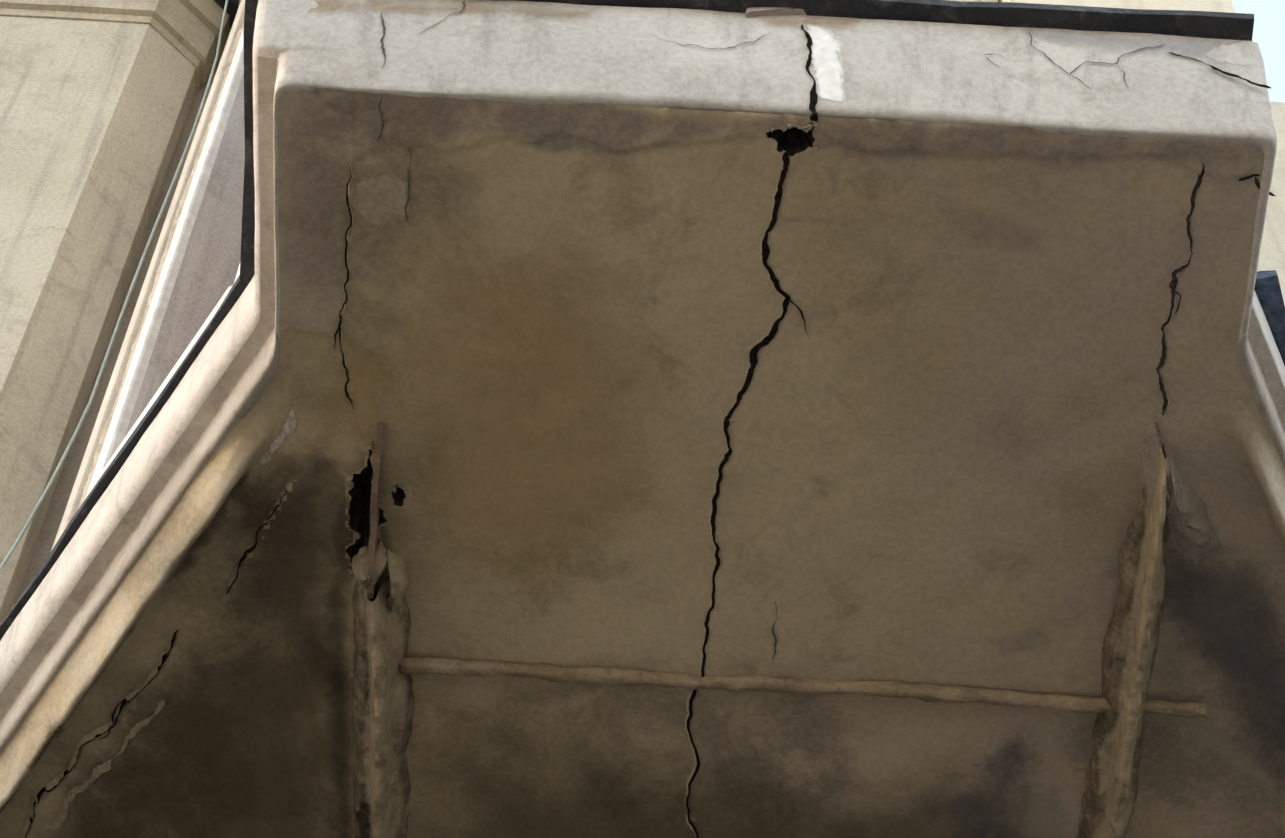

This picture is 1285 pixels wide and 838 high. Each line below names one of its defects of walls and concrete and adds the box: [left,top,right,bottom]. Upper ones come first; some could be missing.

crack [334,161,354,411]
crack [377,11,412,225]
crack [646,33,767,49]
crack [985,31,1271,89]
crack [1156,160,1206,416]
crack [1239,174,1276,196]
crack [226,491,287,595]
spalling [342,440,413,613]
crack [684,24,818,838]
water stain [34,718,69,765]
crack [19,629,179,838]
water stain [79,463,349,838]